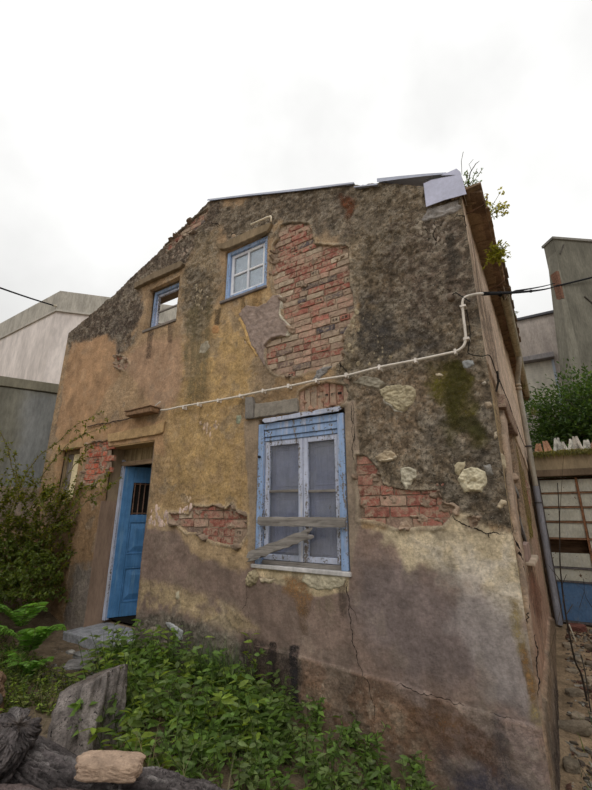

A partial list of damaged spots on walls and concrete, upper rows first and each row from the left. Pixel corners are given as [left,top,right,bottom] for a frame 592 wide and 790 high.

flaking render [267,224,392,379]
flaking render [299,379,349,412]
flaking render [79,440,116,486]
flaking render [149,496,247,551]
flaking render [351,456,482,531]
crack [452,515,540,698]
crack [346,581,375,721]